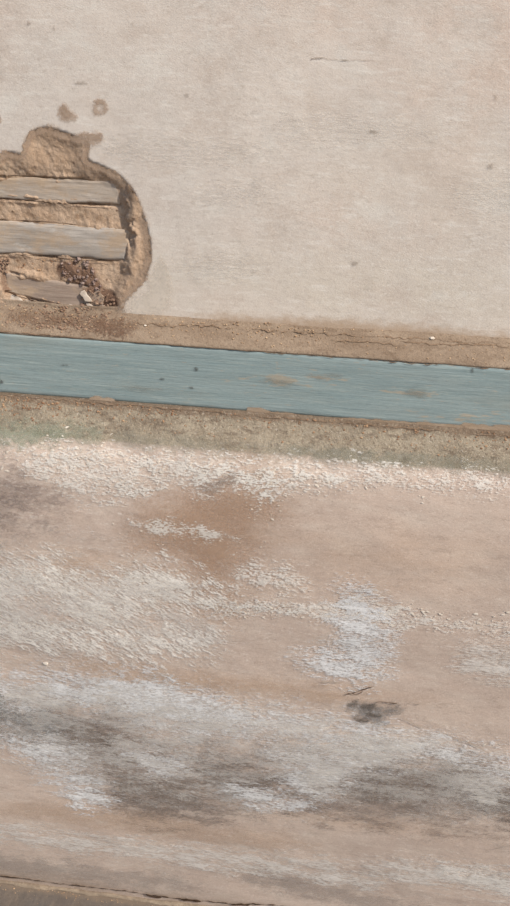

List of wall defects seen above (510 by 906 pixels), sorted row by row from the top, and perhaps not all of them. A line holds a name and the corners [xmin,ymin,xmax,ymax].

peeling [58,104,76,121]
flaking render [0,127,152,312]
leakage [0,694,510,836]
crack [0,876,274,906]